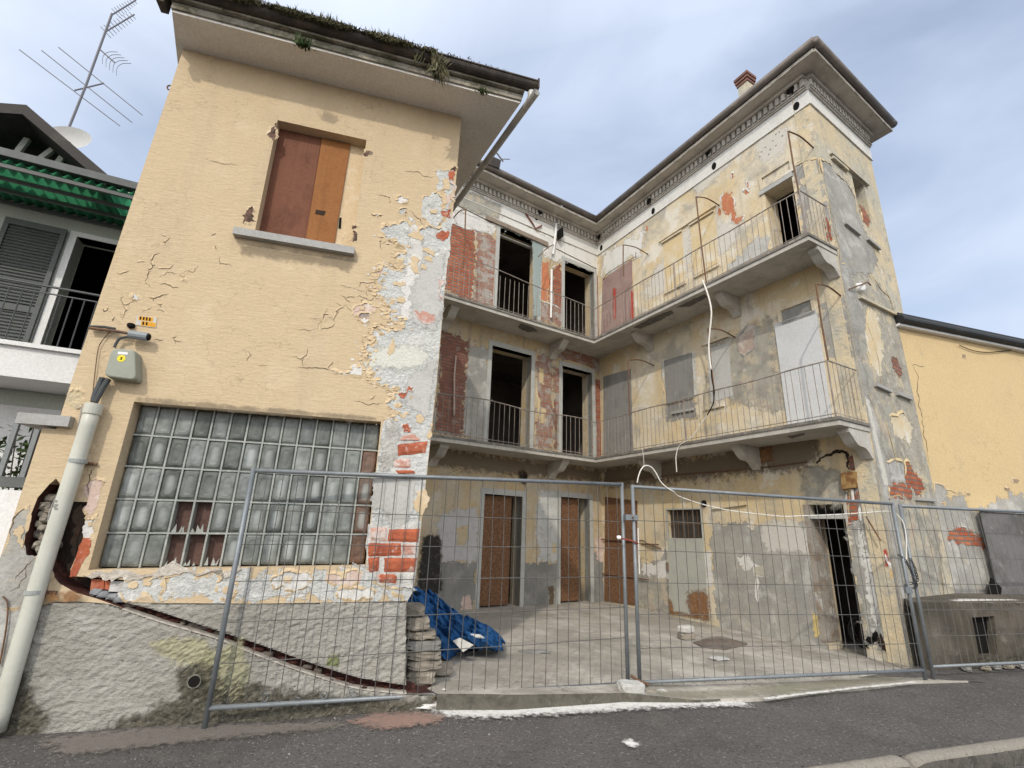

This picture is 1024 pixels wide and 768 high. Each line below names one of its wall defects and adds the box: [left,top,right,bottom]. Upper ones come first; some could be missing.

peeling [716,171,750,224]
crack [103,234,231,321]
crack [293,238,398,370]
peeling [67,166,500,604]
flaking render [533,349,601,457]
crack [816,449,850,472]
peeling [793,157,988,666]